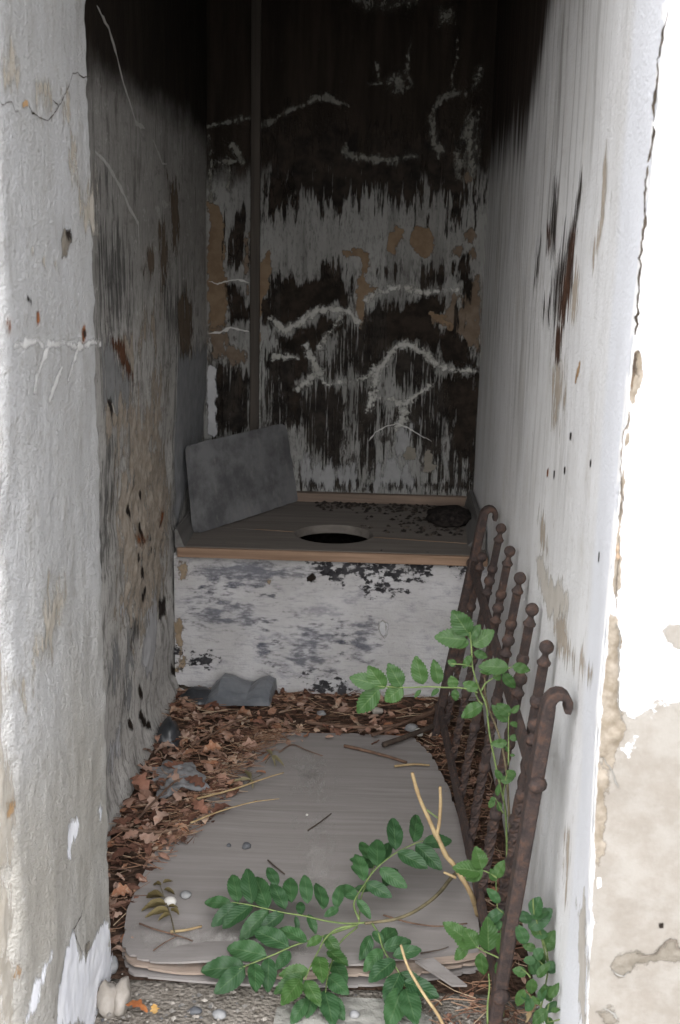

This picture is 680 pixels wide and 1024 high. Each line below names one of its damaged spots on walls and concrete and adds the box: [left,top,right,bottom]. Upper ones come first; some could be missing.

crack [0,72,90,121]
flaking render [206,201,248,368]
flaking render [242,231,272,317]
flaking render [342,248,378,329]
flaking render [387,226,435,259]
flaking render [428,274,482,352]
leakage [533,163,560,327]
leakage [174,549,434,672]
leakage [258,619,379,696]
peeling [537,350,680,1024]